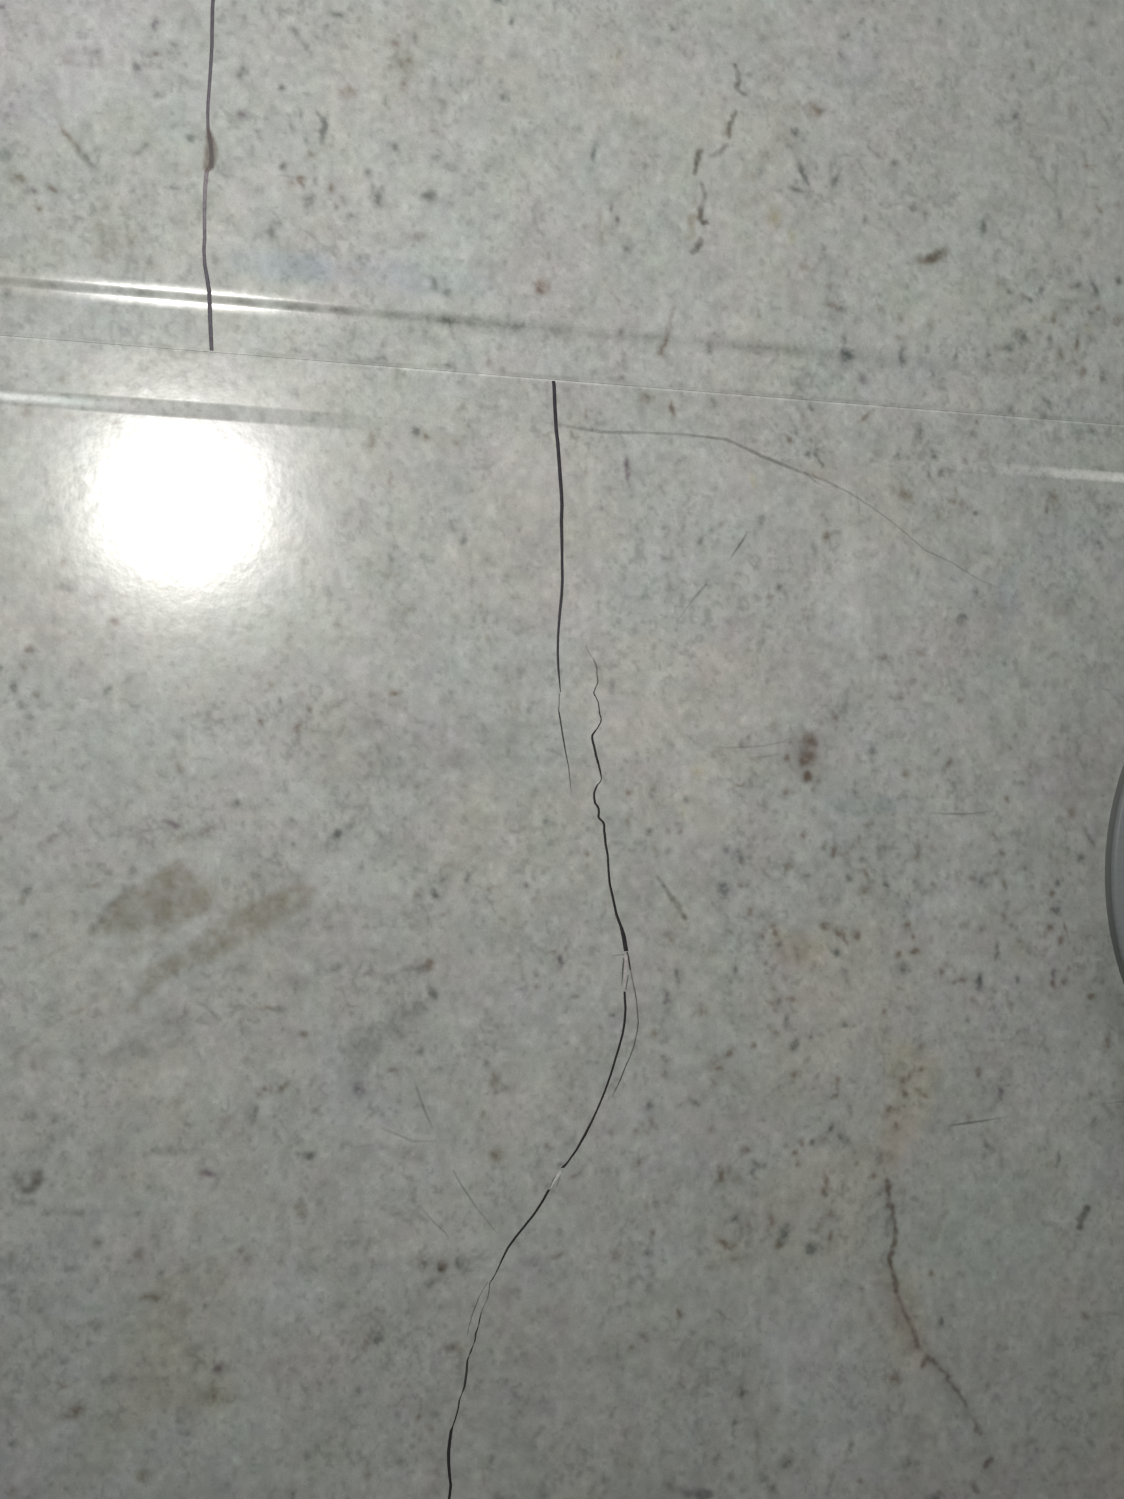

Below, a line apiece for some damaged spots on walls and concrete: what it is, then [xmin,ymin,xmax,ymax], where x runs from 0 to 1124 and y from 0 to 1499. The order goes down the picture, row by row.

crack [202,0,215,351]
crack [447,381,639,1499]